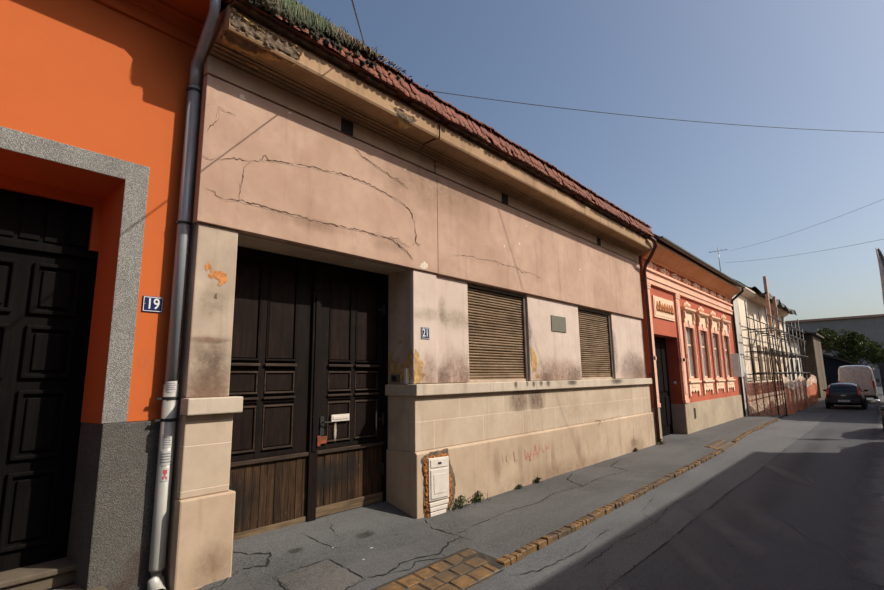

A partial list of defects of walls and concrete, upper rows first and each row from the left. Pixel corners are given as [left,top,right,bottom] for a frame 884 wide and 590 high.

peeling [221,35,296,67]
crack [201,149,420,260]
peeling [205,262,228,299]
crack [454,255,540,278]
peeling [388,340,425,384]
spalling [421,448,456,518]